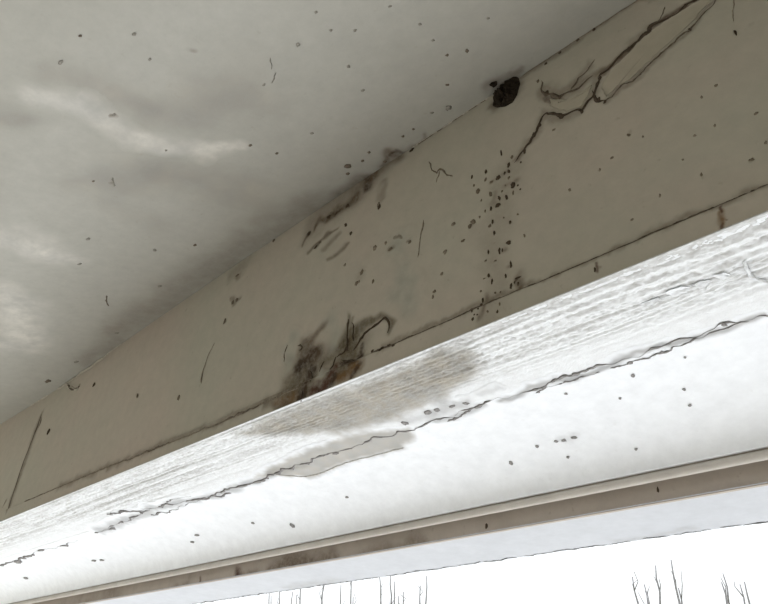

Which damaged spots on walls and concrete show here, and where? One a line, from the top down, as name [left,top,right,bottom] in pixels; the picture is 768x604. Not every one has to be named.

crack [514,0,737,163]
corrosion [259,298,398,416]
damp [229,138,538,482]
damp [551,429,585,459]